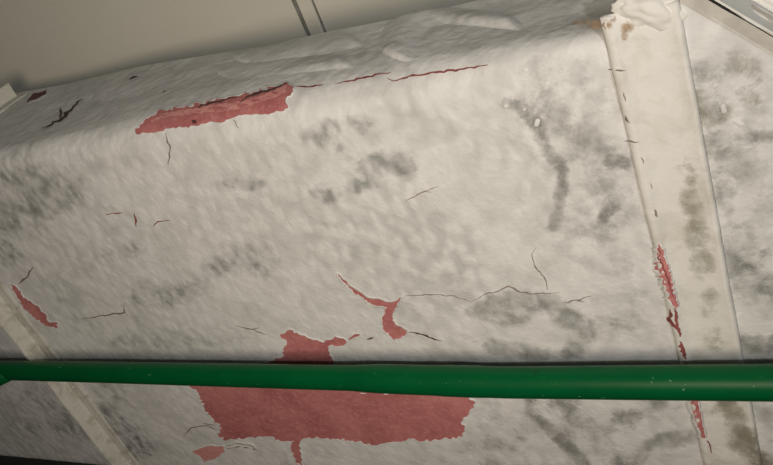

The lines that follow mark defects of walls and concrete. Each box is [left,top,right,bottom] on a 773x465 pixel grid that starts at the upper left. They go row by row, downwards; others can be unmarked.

crack [296,65,486,87]
peeling [135,81,295,135]
peeling [9,267,60,329]
peeling [336,272,441,341]
crack [408,249,591,303]
peeling [651,242,687,359]
peeling [253,329,374,365]
peeling [189,386,477,465]
peeling [685,401,707,439]